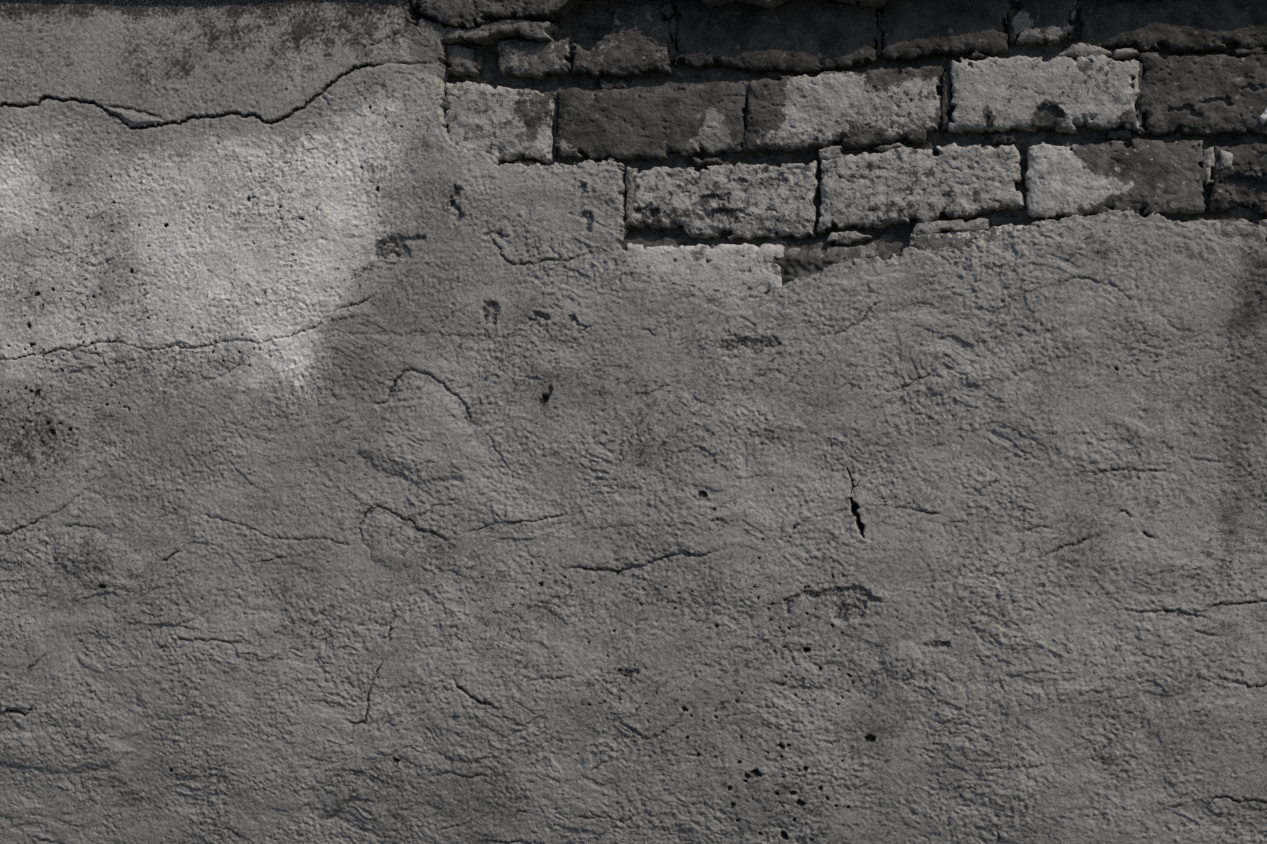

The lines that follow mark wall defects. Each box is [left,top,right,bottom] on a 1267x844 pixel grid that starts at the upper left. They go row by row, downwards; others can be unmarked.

crack [0,24,411,130]
flaking render [444,0,1267,295]
crack [0,267,371,367]
crack [377,369,471,421]